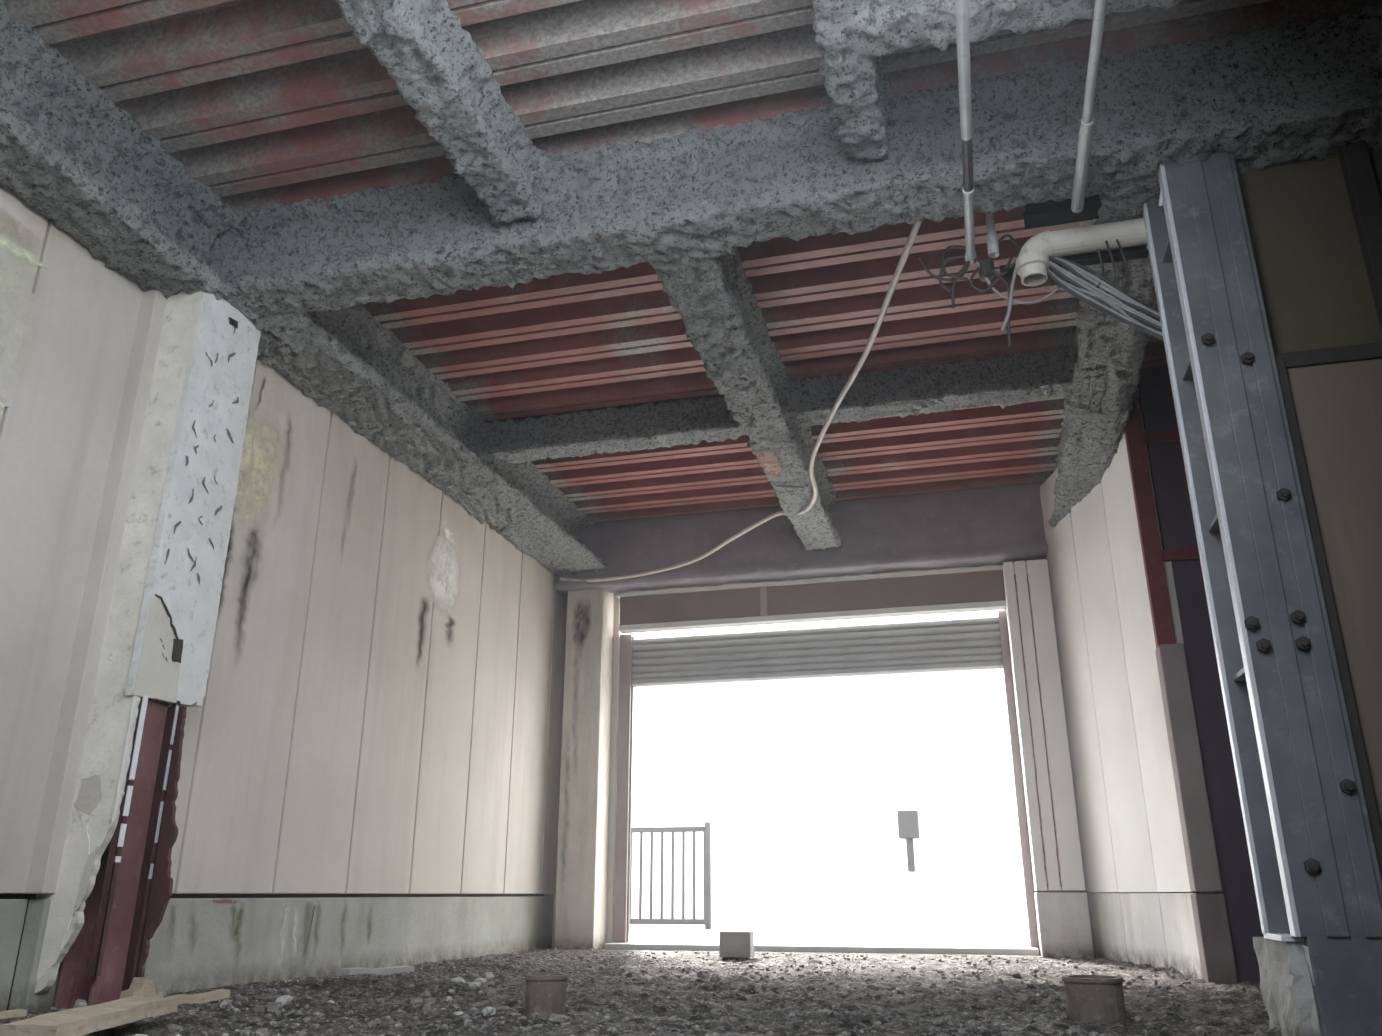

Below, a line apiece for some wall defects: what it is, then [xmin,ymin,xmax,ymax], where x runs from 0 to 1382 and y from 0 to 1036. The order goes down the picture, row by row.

leakage [219,530,258,630]
peeling [36,775,103,981]